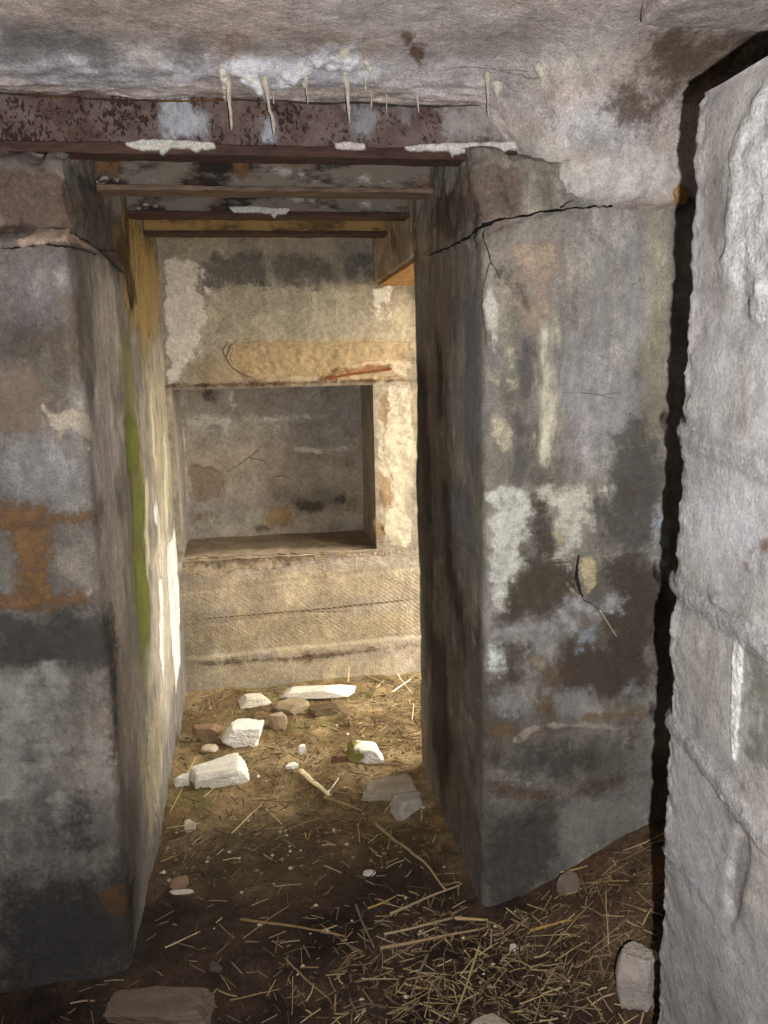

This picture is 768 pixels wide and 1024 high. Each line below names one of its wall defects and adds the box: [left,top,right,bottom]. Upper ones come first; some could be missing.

efflorescence [220,45,379,103]
leakage [605,27,768,125]
efflorescence [125,98,216,155]
efflorescence [262,119,273,141]
efflorescence [335,108,375,150]
crack [0,227,124,274]
crack [426,200,614,345]
peeling [162,257,215,385]
corrosion [194,364,394,387]
corrosion [0,503,96,612]
leakage [486,419,668,720]
crack [571,548,661,610]